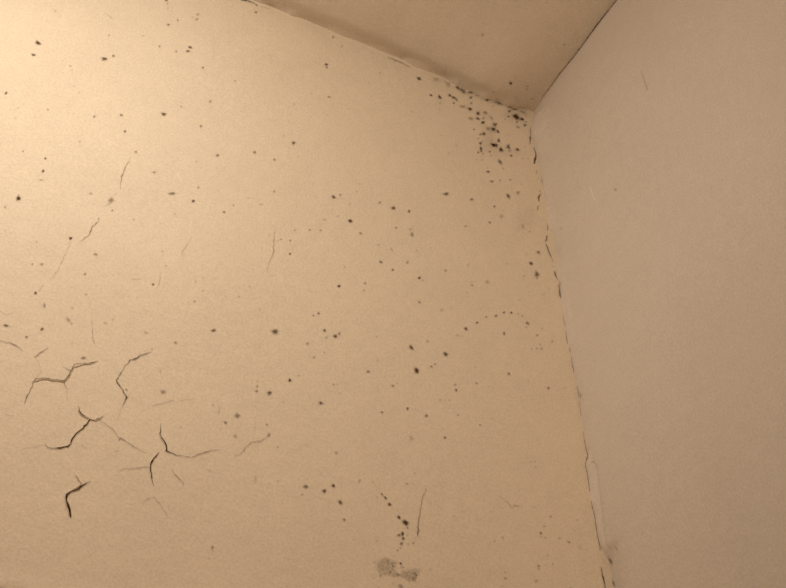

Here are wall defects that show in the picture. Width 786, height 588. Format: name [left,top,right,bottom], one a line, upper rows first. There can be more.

crack [25,361,97,401]
crack [46,409,104,449]
crack [149,427,182,486]
crack [64,476,90,517]